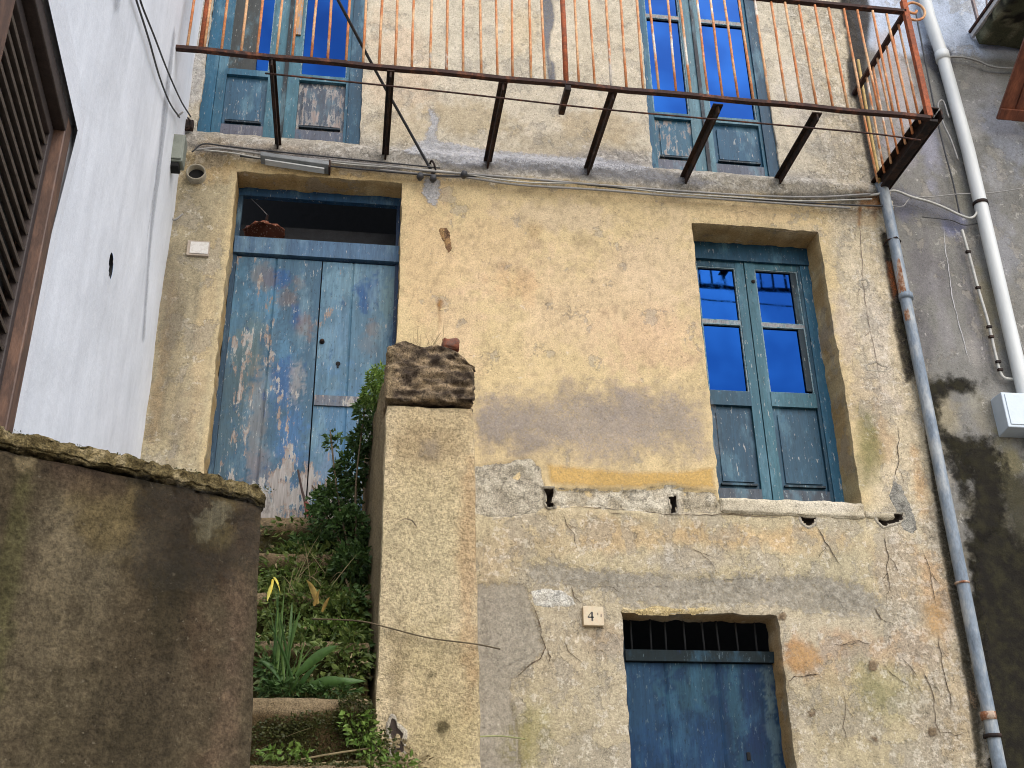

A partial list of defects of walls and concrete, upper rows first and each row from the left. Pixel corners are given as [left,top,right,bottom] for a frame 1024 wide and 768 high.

corrosion [889,258,906,294]
spalling [475,459,717,517]
spalling [889,482,917,533]
crack [875,537,898,623]
damp [926,376,1024,768]
crack [519,603,580,675]
crack [923,633,963,739]